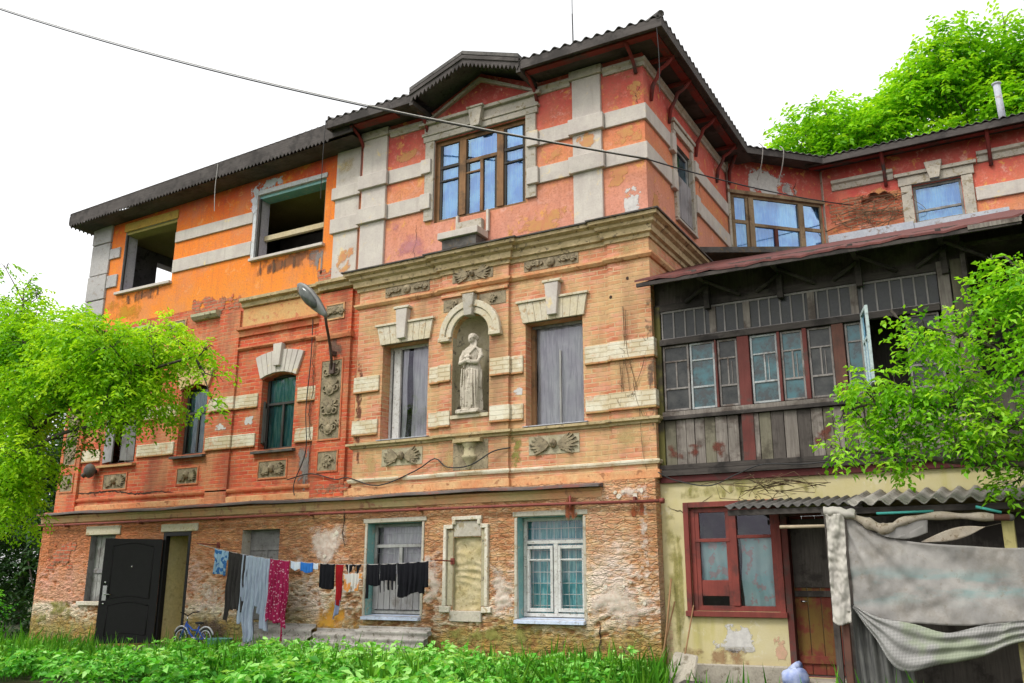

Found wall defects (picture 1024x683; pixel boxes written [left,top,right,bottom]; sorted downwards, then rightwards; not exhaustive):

peeling [608,165,641,212]
peeling [748,168,797,195]
flaking render [827,187,904,229]
flaking render [192,293,242,314]
water stain [668,532,684,631]
peeling [712,624,755,653]